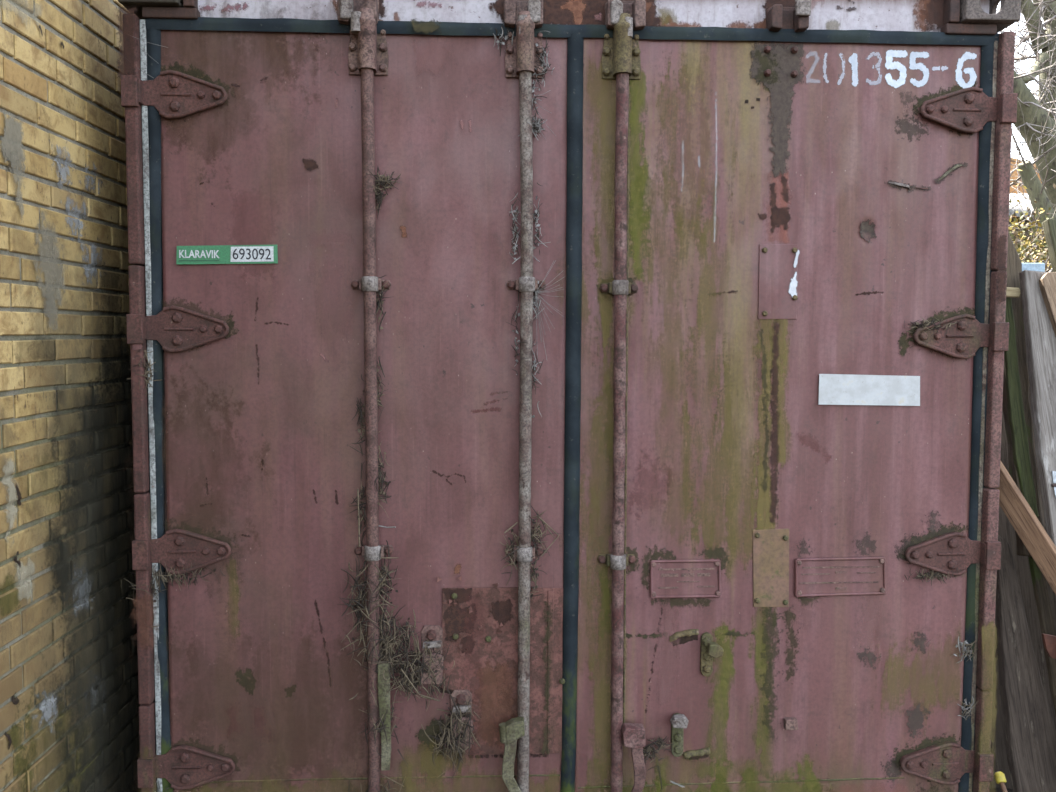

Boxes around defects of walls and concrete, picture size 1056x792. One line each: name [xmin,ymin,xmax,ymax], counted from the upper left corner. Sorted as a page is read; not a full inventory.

peeling [489,0,505,22]
peeling [543,0,608,25]
peeling [624,0,661,27]
water stain [16,559,34,602]